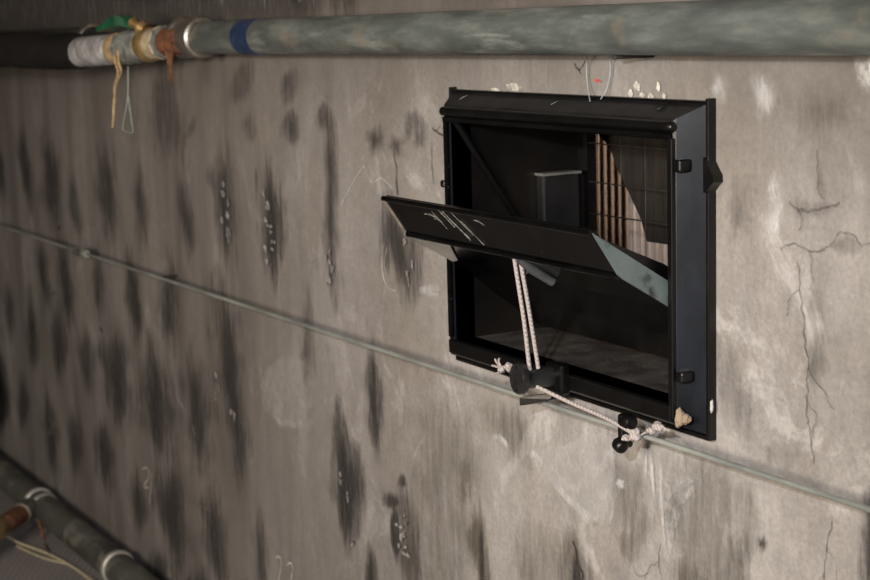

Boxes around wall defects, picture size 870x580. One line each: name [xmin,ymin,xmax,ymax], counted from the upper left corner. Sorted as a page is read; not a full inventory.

leakage [262,165,283,285]
leakage [382,204,421,288]
leakage [80,341,131,419]
leakage [126,269,178,452]
leakage [187,295,246,469]
leakage [333,402,364,547]
leakage [384,476,418,580]